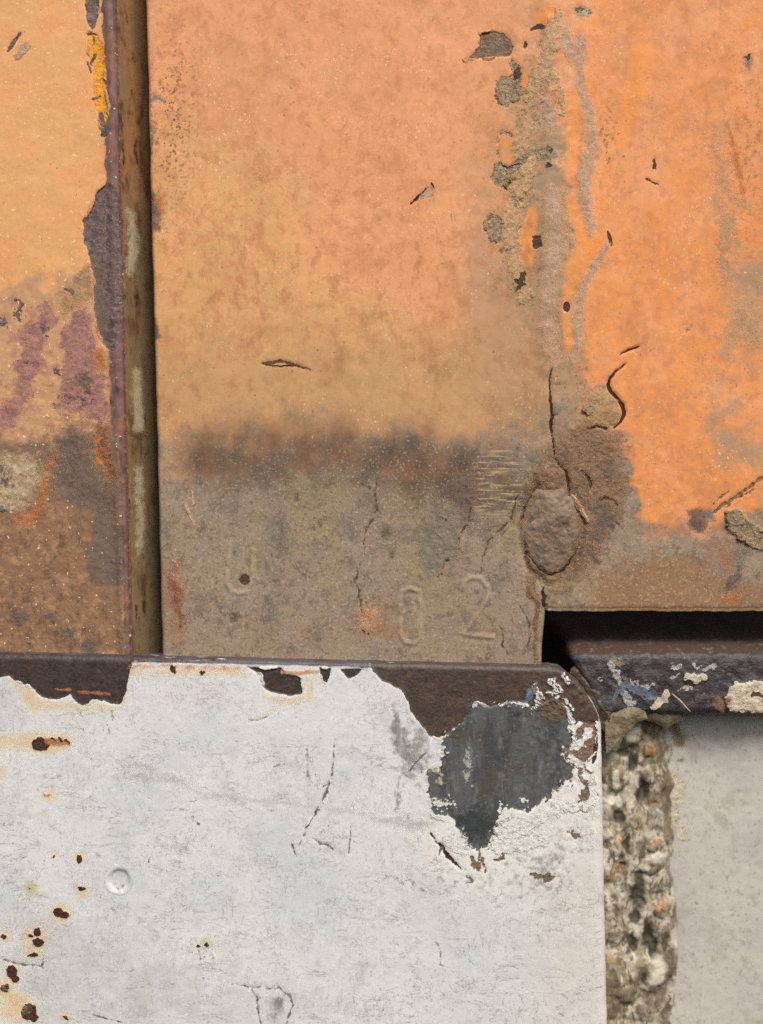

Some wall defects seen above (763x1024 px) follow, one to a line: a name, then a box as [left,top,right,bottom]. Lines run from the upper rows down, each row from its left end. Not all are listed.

peeling [61,183,140,370]
rust [0,297,123,485]
crack [588,346,640,430]
crack [549,368,618,506]
crack [712,476,763,514]
peeling [0,652,133,709]
peeling [713,680,763,714]
rust [0,735,70,752]
peeling [248,661,600,873]
crack [429,832,474,883]
rust [26,927,44,957]
rust [0,965,39,1022]